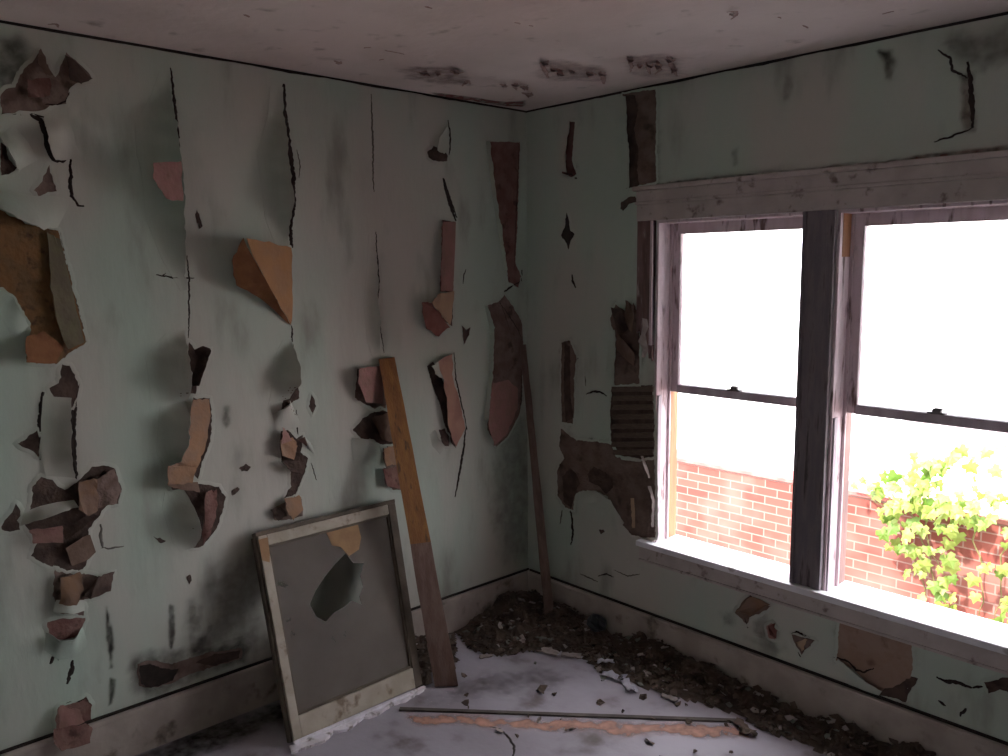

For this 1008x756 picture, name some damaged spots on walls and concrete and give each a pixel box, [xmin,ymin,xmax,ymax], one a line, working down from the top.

flaking render [0,52,91,115]
crack [0,11,1008,189]
flaking render [490,142,521,287]
flaking render [618,90,656,214]
flaking render [0,210,86,408]
flaking render [170,342,239,548]
flaking render [427,362,456,448]
flaking render [487,295,523,447]
flaking render [557,303,657,538]
flaking render [25,465,122,640]
flaking render [133,648,244,692]
flaking render [832,622,918,703]